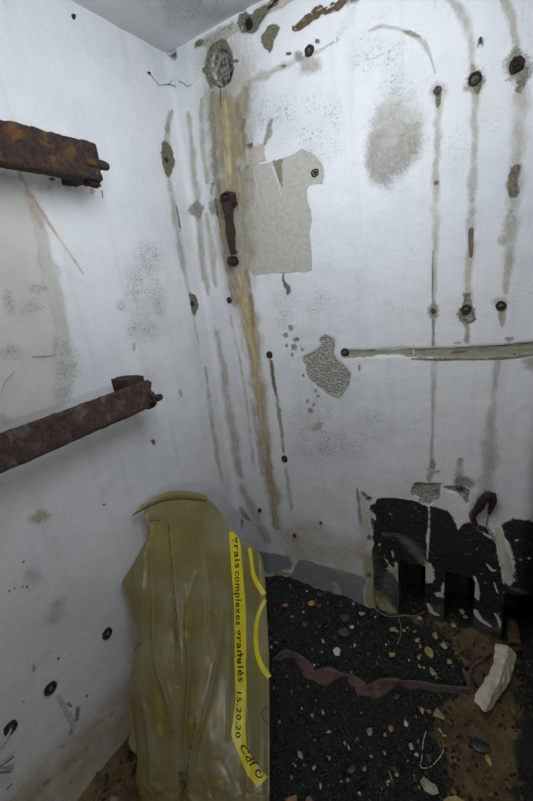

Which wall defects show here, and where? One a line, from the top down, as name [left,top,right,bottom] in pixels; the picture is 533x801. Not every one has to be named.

spalling [195,0,292,88]
spalling [292,0,357,32]
peeling [238,143,324,295]
spalling [283,325,360,413]
spalling [410,477,474,504]
peeling [495,528,515,586]